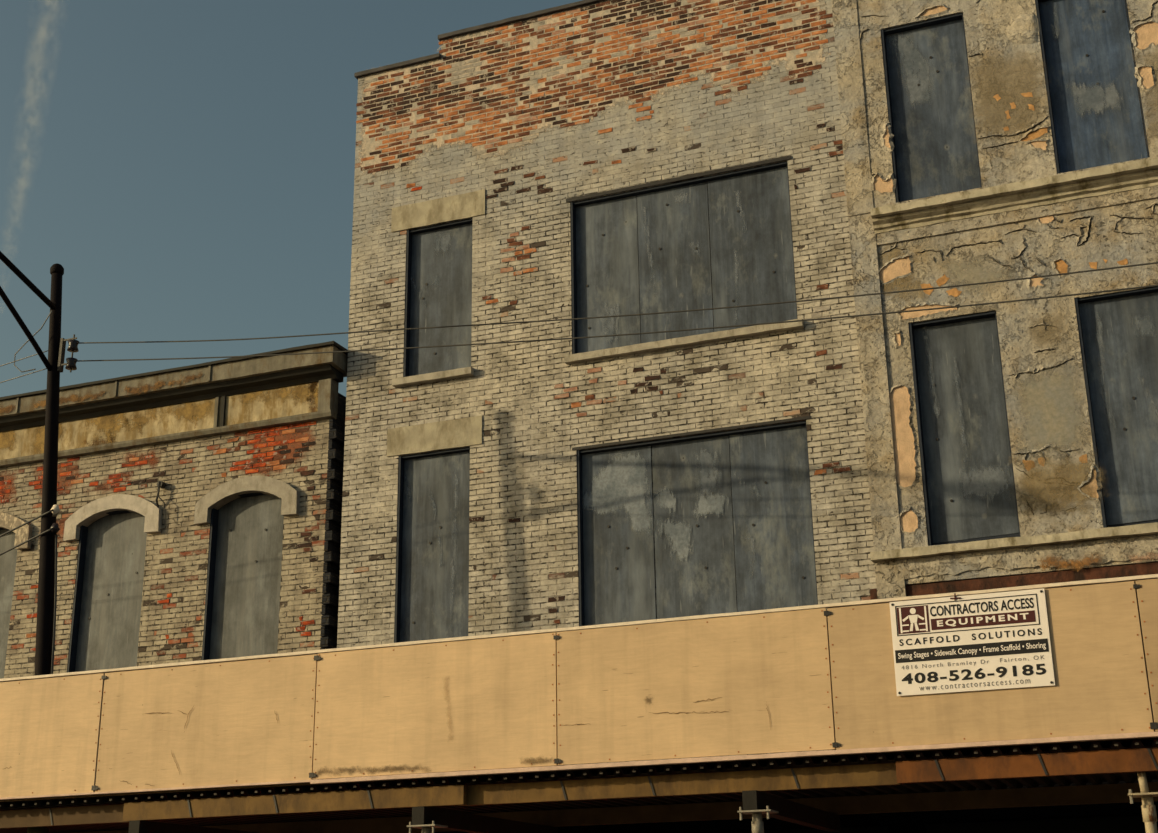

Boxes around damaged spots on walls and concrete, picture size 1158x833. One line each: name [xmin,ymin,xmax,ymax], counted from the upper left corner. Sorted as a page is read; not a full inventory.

crack [1132,0,1158,22]
flaking render [1129,19,1158,92]
peeling [356,0,833,199]
crack [977,116,1048,149]
crack [881,201,1158,272]
flaking render [879,254,962,349]
crack [1009,320,1072,379]
peeling [57,452,165,495]
peeling [213,421,316,491]
flaking render [889,384,920,490]
crack [1012,443,1090,515]
rust [1040,556,1100,571]